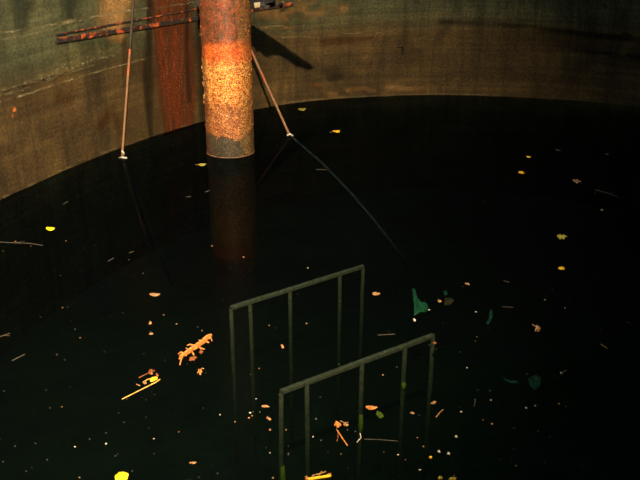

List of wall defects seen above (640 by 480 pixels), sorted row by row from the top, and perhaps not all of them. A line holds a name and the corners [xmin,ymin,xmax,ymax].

rust [145,0,204,136]